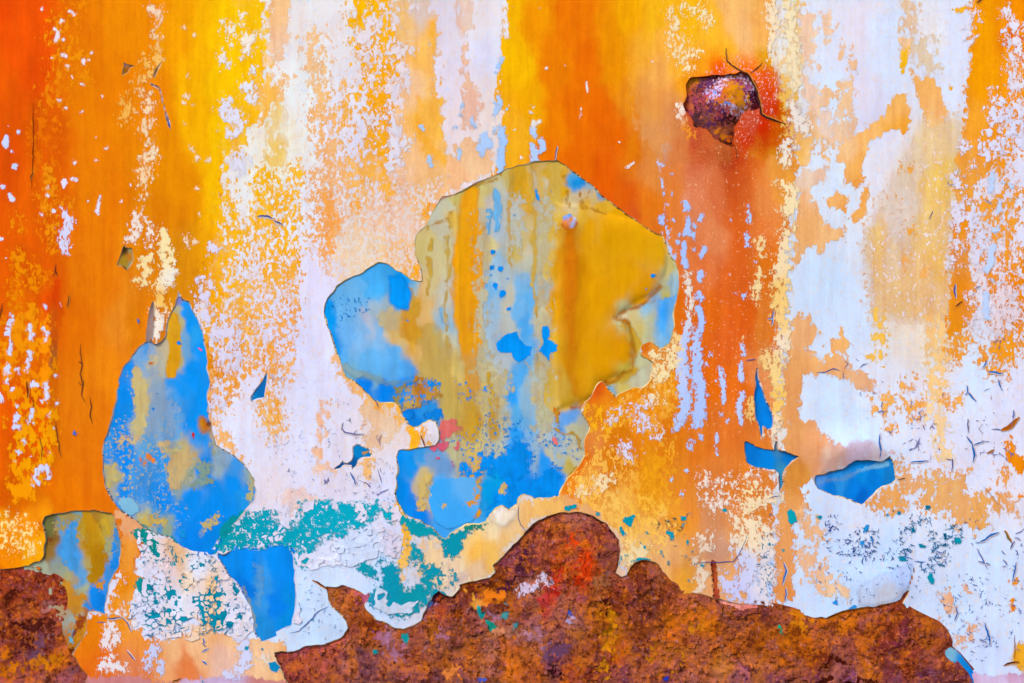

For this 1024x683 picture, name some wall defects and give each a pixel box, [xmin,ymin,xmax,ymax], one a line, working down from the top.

corrosion [0,0,498,683]
peeling [24,0,818,681]
corrosion [272,0,984,683]
peeling [814,456,897,505]
corrosion [823,0,1024,539]
corrosion [1009,640,1024,671]